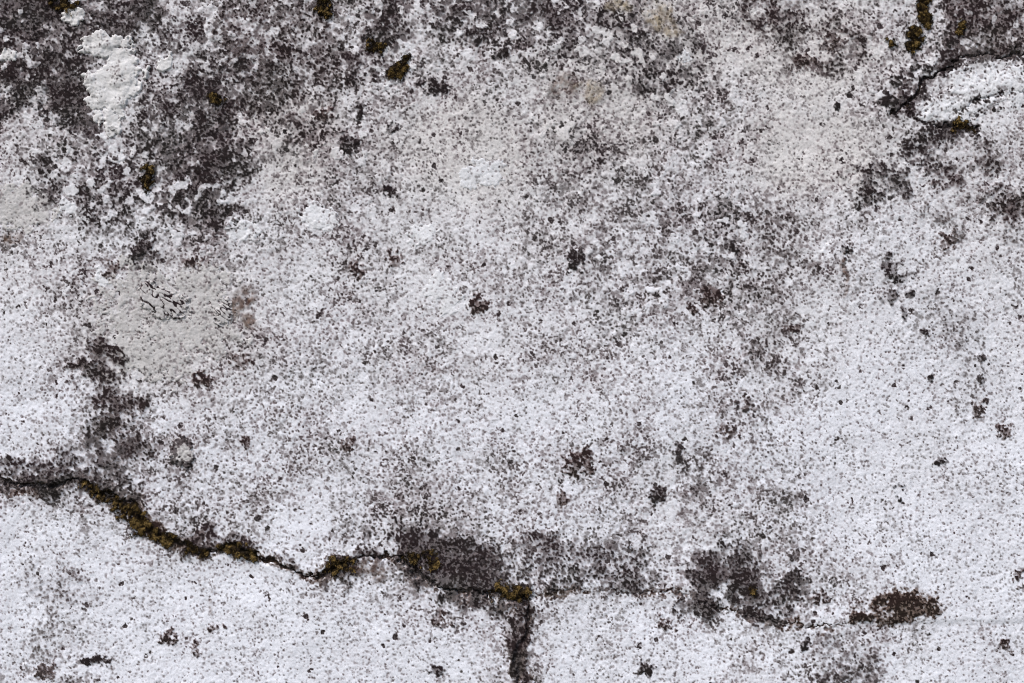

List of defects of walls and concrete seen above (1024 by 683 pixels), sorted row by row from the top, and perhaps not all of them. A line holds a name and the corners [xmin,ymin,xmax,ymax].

water stain [0,0,717,268]
crack [886,39,1024,144]
crack [0,471,851,683]
water stain [321,516,661,683]
mould [671,532,807,627]